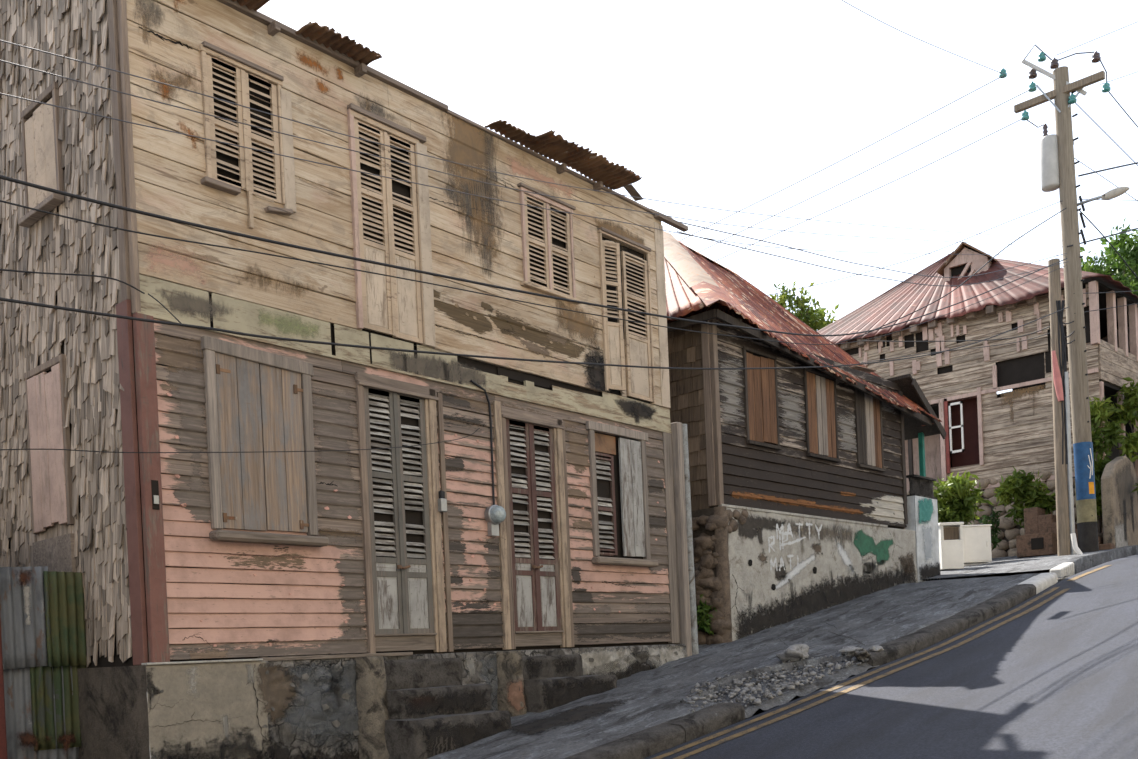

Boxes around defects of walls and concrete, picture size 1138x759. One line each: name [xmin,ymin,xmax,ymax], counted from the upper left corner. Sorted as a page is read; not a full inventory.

water stain [446,114,501,276]
water stain [481,301,655,423]
peeling [209,546,307,576]
peeling [306,387,367,642]
peeling [441,504,526,711]
water stain [735,560,941,640]
water stain [151,715,359,759]
spalling [258,661,359,753]